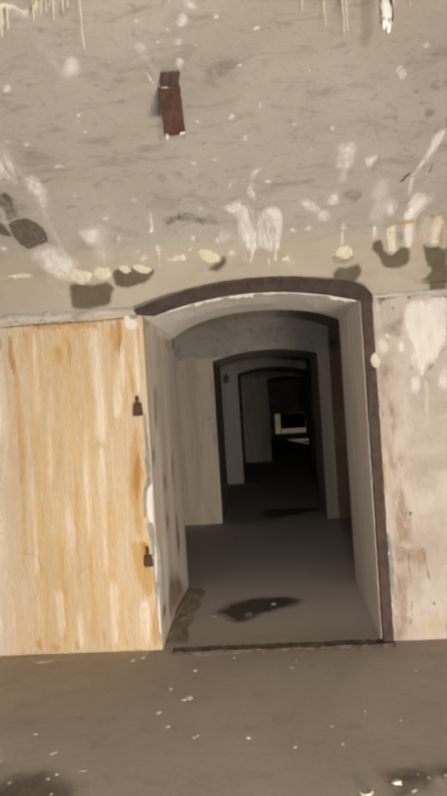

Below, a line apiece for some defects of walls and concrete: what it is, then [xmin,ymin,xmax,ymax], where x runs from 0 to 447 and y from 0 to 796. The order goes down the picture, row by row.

leakage [381,0,392,26]
leakage [418,130,445,169]
leakage [25,176,46,207]
peeling [0,193,17,237]
leakage [226,202,291,264]
leakage [371,196,447,392]
rust [0,315,174,664]
leakage [395,489,426,570]
leakage [0,771,74,796]